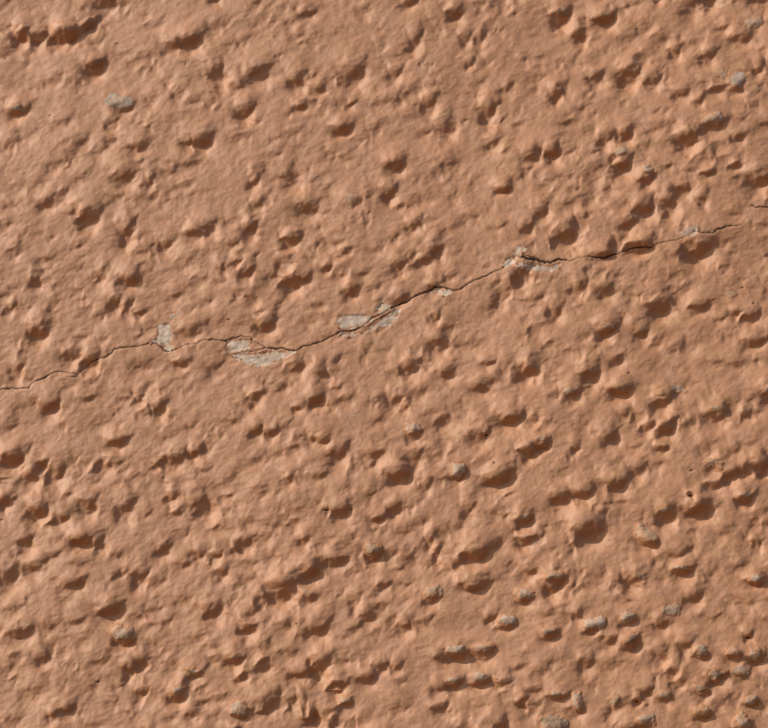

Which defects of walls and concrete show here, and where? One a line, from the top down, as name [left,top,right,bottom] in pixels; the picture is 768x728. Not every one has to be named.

peeling [501,245,561,273]
crack [0,205,768,390]
peeling [334,301,403,338]
peeling [148,321,176,353]
peeling [222,337,297,369]